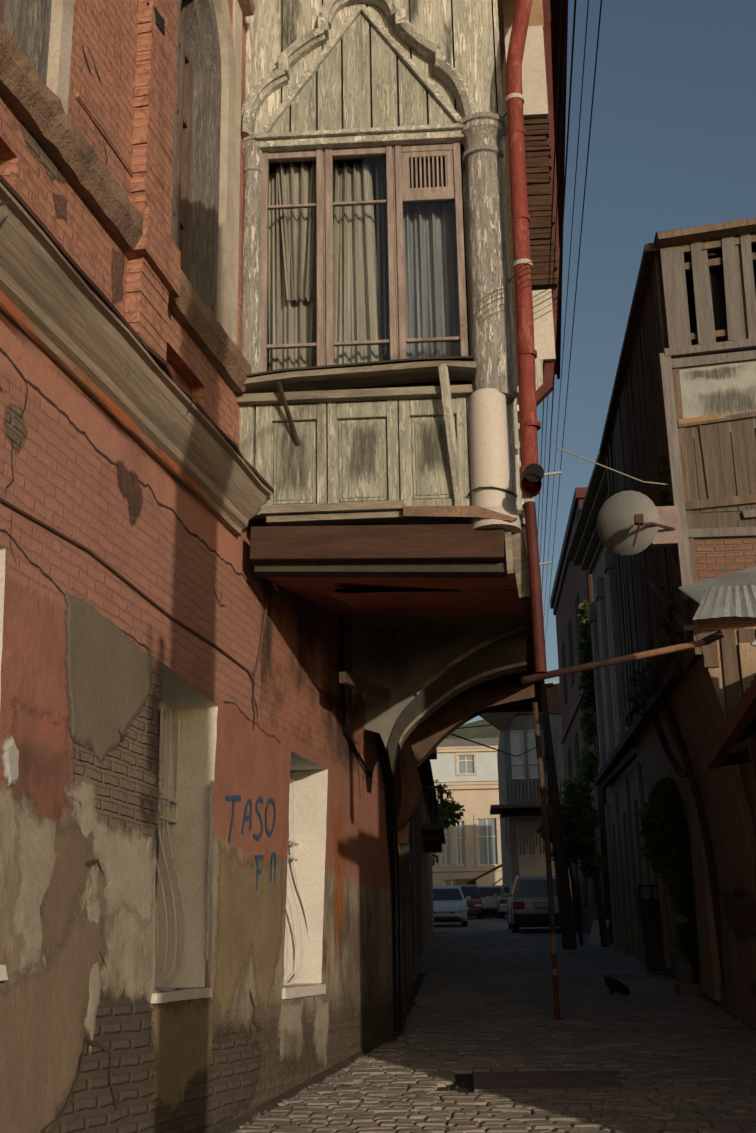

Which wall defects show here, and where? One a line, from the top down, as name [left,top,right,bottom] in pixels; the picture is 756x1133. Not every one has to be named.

water stain [694,367,734,378]
spalling [4,403,27,453]
spalling [117,461,143,525]
crack [0,347,263,607]
water stain [282,434,306,488]
water stain [421,425,443,471]
crack [100,615,151,653]
crack [224,671,281,743]
flaking render [0,669,162,1133]